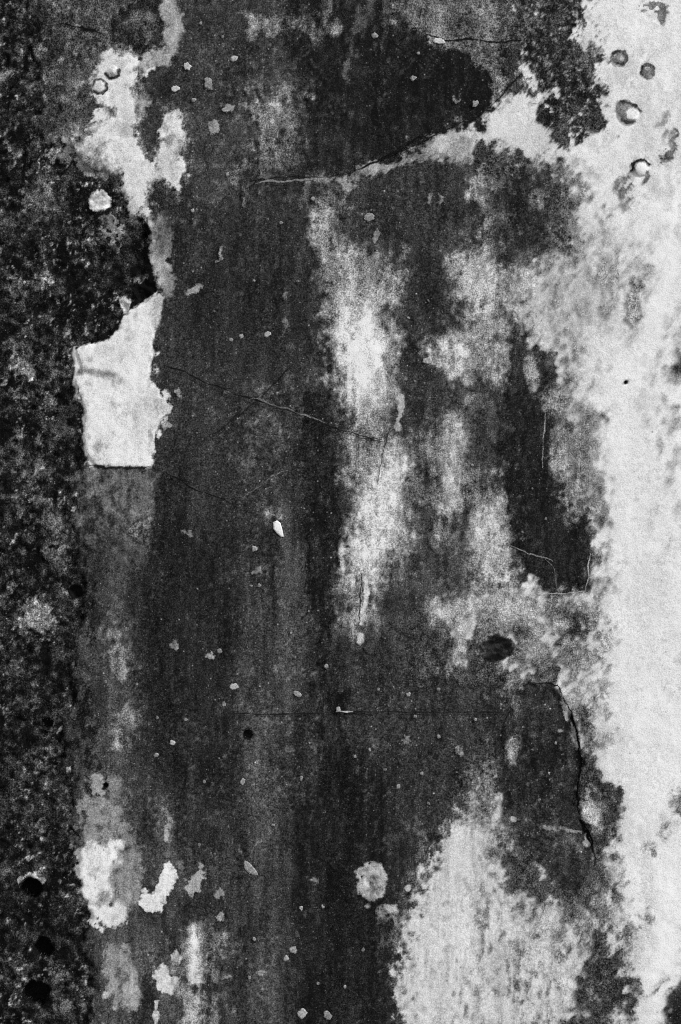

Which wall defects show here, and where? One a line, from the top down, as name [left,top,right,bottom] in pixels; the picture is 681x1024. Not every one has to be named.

crack [426,34,522,43]
crack [252,73,522,184]
damp [125,179,159,228]
damp [542,281,578,329]
damp [586,229,656,335]
spalling [0,0,190,1024]
crack [536,682,596,865]
damp [420,857,443,882]
damp [476,885,492,957]
damp [485,686,647,1024]